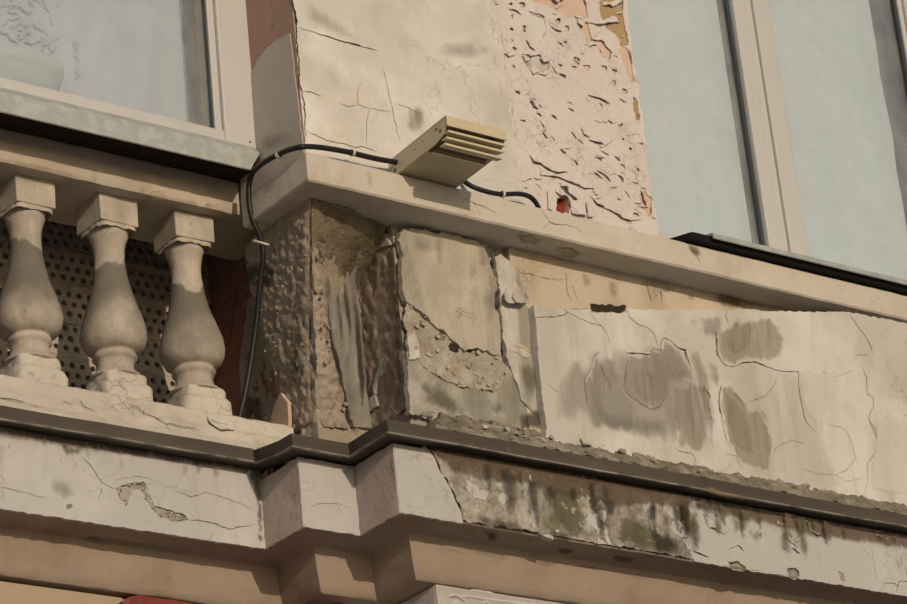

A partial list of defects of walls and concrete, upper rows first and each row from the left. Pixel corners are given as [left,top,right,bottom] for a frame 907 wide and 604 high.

crack [256,0,421,153]
spalling [504,0,639,121]
spalling [515,89,657,221]
spalling [239,210,349,432]
spalling [403,303,507,392]
peeling [504,288,529,304]
crack [715,314,880,491]
spalling [116,480,189,521]
crack [85,460,254,540]
spalling [428,449,694,560]
water stain [436,449,907,551]